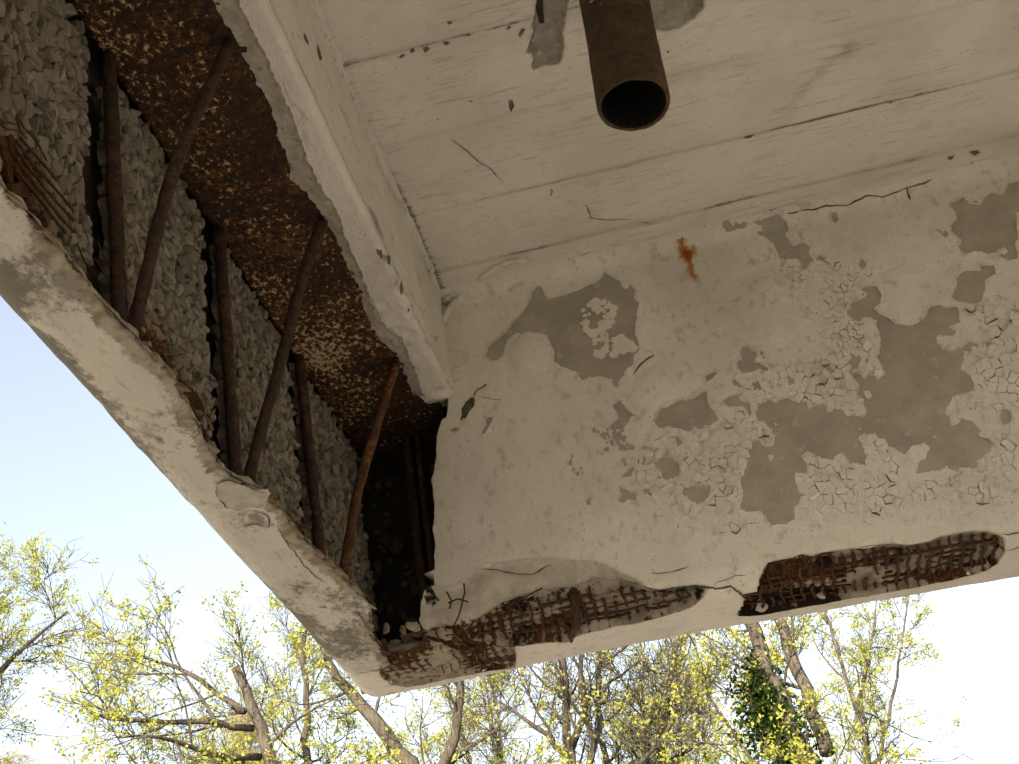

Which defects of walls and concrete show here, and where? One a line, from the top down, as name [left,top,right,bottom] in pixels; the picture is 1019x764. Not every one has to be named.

crack [750,179,932,223]
rust [678,237,697,280]
spalling [0,0,708,687]
peeling [480,181,1019,537]
spalling [738,532,1005,616]